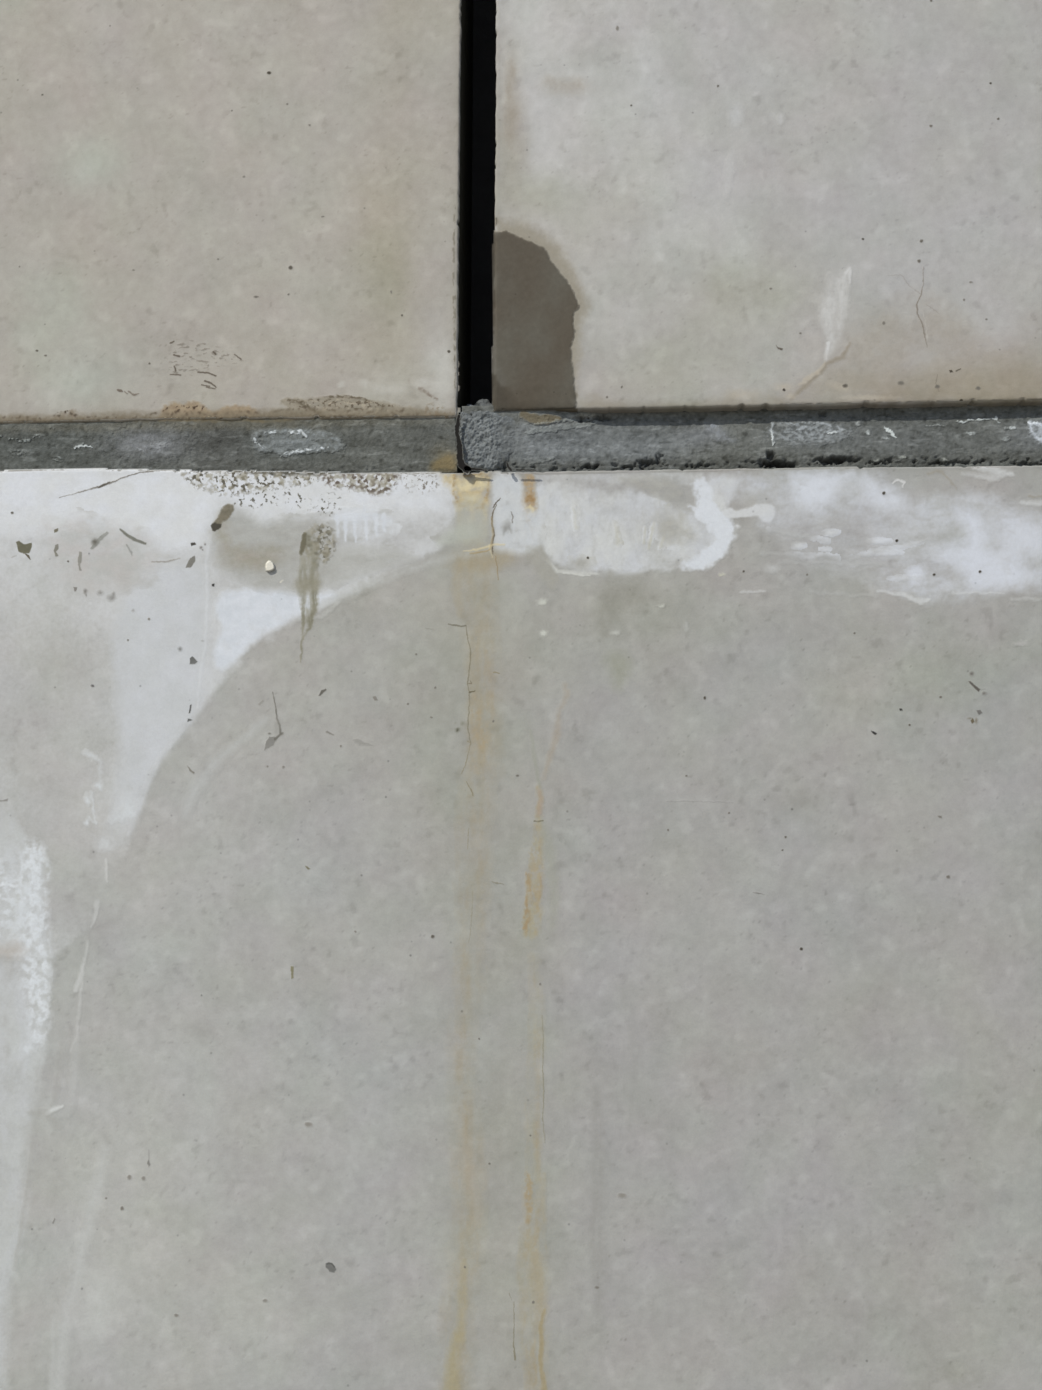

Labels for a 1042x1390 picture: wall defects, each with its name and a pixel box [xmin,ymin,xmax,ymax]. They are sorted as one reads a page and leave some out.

water stain [335,340,460,402]
water stain [717,265,1042,449]
corrosion [426,450,493,547]
corrosion [522,473,540,509]
water stain [0,418,1042,1390]